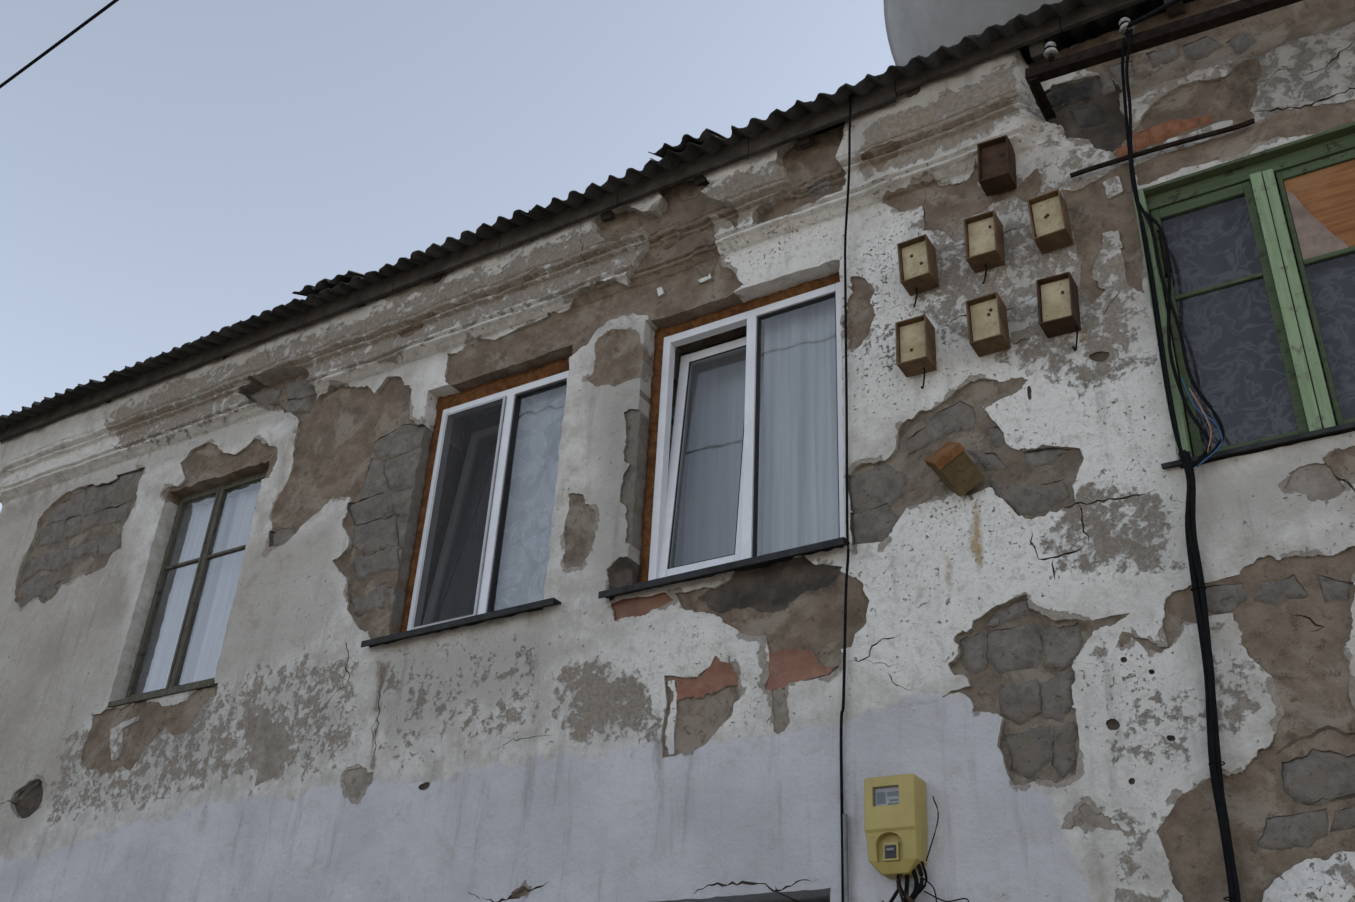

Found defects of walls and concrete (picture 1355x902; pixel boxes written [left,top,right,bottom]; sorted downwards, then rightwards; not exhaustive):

crack [1251,39,1355,113]
peeling [842,276,876,349]
spalling [14,467,145,608]
spalling [161,364,433,648]
peeling [444,126,869,734]
spalling [848,377,1084,546]
peeling [1284,445,1355,502]
crack [1321,454,1355,492]
peeling [81,683,218,775]
peeling [661,656,740,758]
peeling [942,546,1355,902]
crack [695,879,818,902]